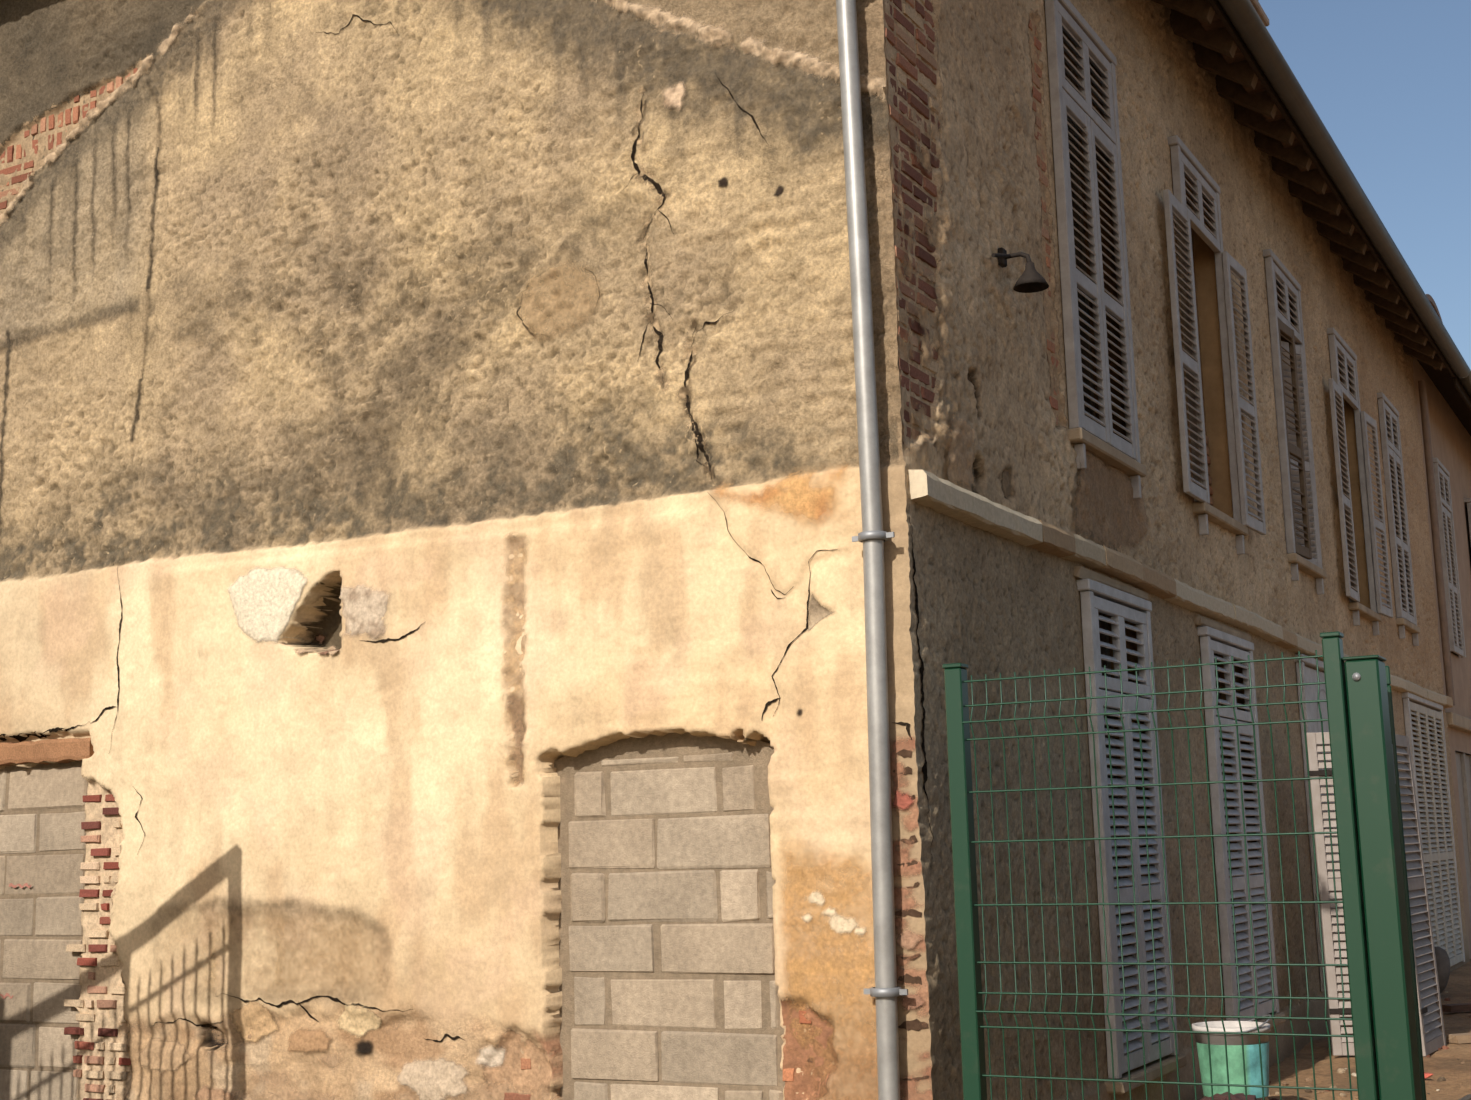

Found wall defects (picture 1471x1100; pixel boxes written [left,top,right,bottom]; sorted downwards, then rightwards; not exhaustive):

flaking render [0,54,150,215]
water stain [146,147,159,289]
crack [516,268,549,337]
water stain [0,319,82,502]
water stain [131,373,143,441]
water stain [0,408,737,581]
crack [623,86,837,721]
crack [109,567,122,753]
spalling [228,567,425,655]
crack [909,506,934,858]
flaking render [64,775,410,1100]
spalling [398,1030,561,1100]